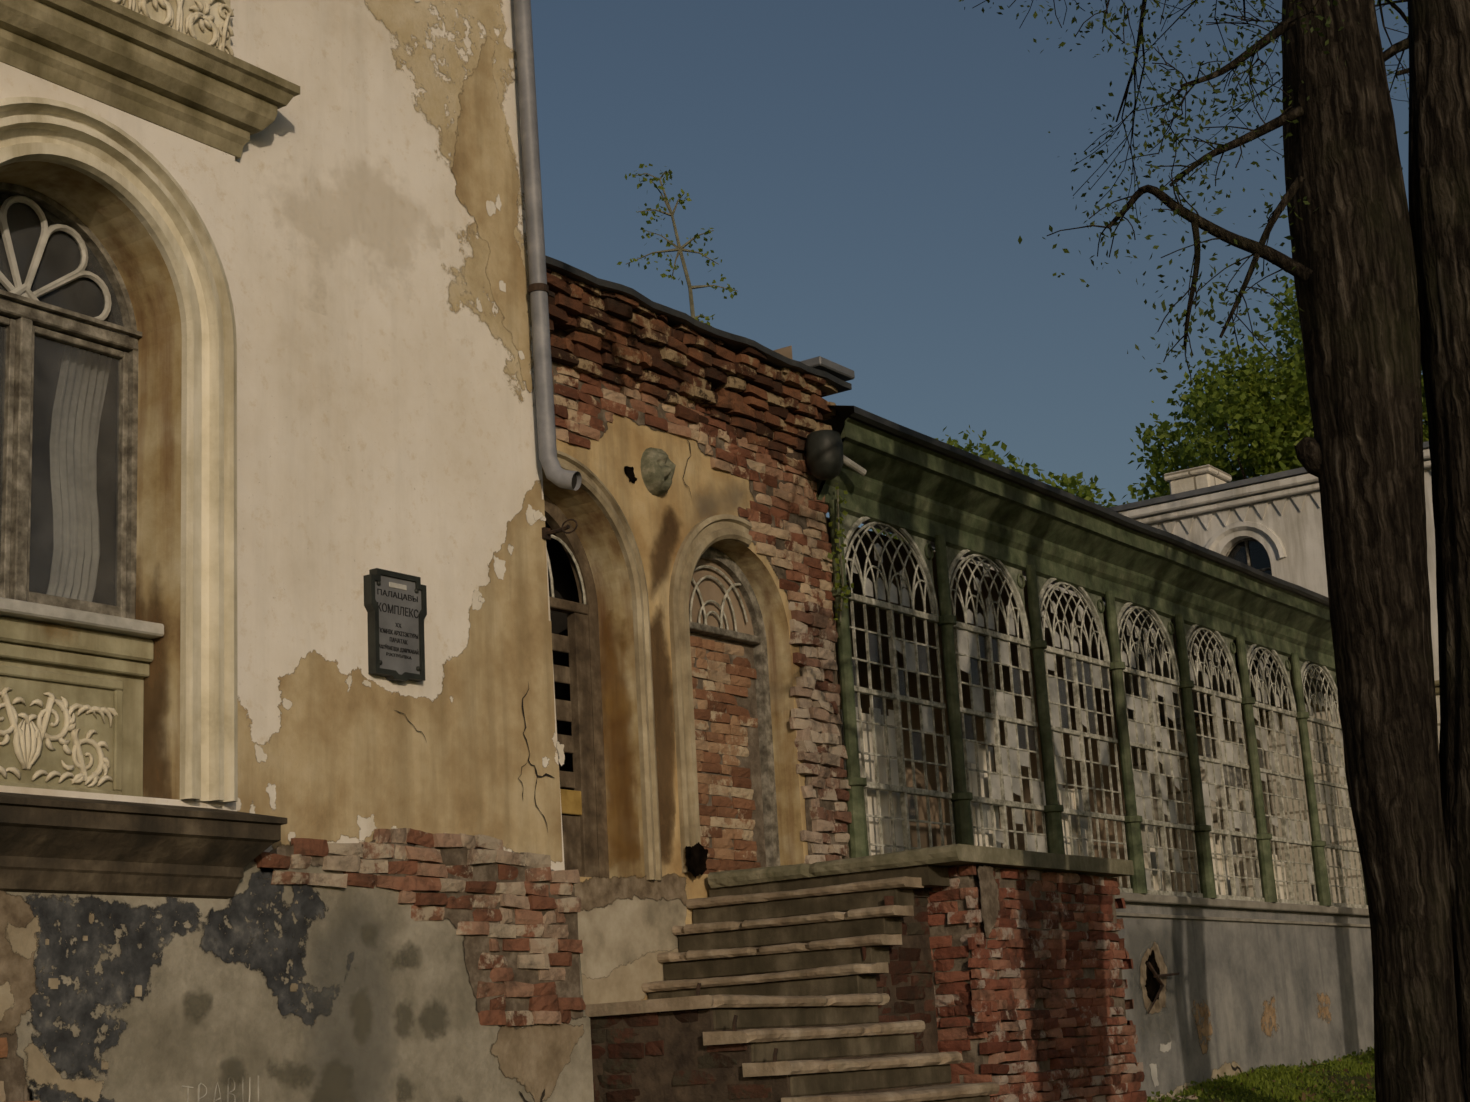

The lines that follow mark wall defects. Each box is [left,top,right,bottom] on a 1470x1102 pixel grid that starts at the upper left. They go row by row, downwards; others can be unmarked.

flaking render [364,0,852,864]
flaking render [0,480,708,1102]
crack [519,683,554,831]
water stain [185,994,211,1019]
water stain [397,1003,446,1038]
hole [1140,942,1180,1014]
water stain [270,1062,356,1102]
crack [519,1089,545,1102]